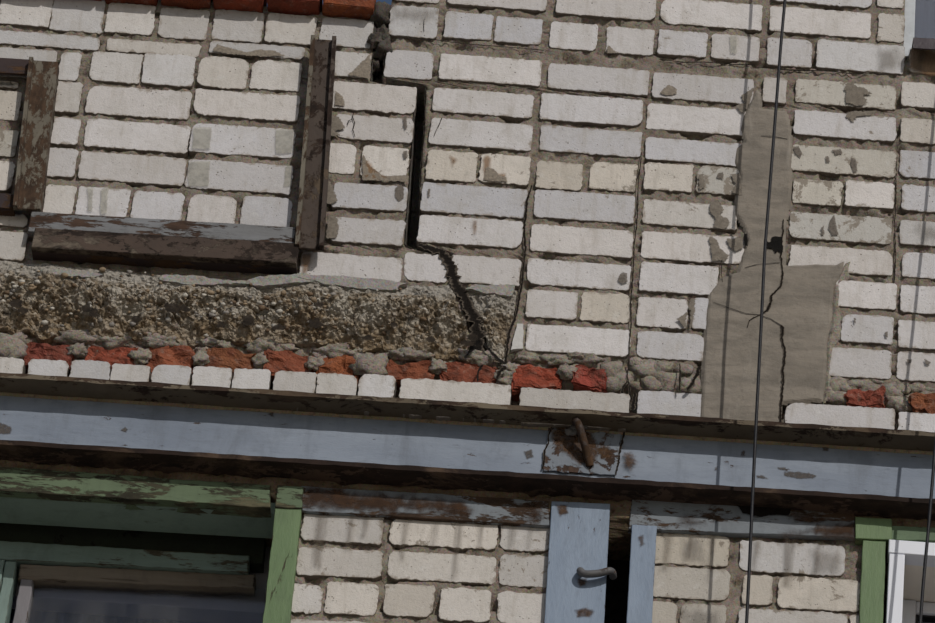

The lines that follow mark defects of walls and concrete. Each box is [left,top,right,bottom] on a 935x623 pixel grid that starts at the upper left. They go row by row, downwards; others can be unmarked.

spalling [0,260,524,364]
crack [371,50,532,392]
crack [714,219,786,421]